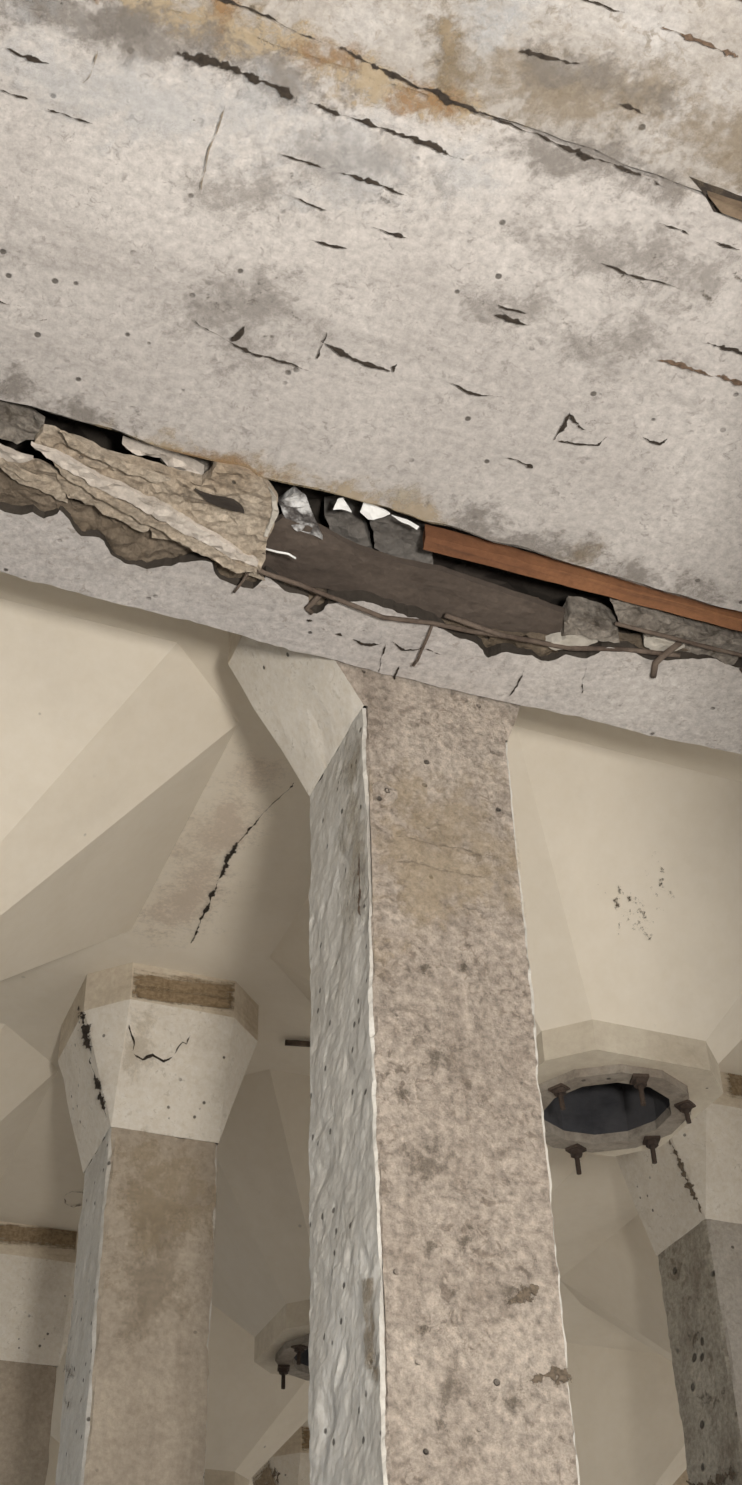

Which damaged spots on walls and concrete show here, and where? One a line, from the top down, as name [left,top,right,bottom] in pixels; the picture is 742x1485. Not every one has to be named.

crack [2,48,92,124]
rust [119,0,491,140]
crack [177,0,663,194]
leakage [434,16,468,97]
crack [662,26,738,57]
crack [280,154,404,195]
crack [297,198,406,249]
spalling [0,400,742,679]
crack [191,783,294,943]
crack [78,1006,106,1114]
crack [129,1025,190,1062]
crack [669,1140,701,1212]